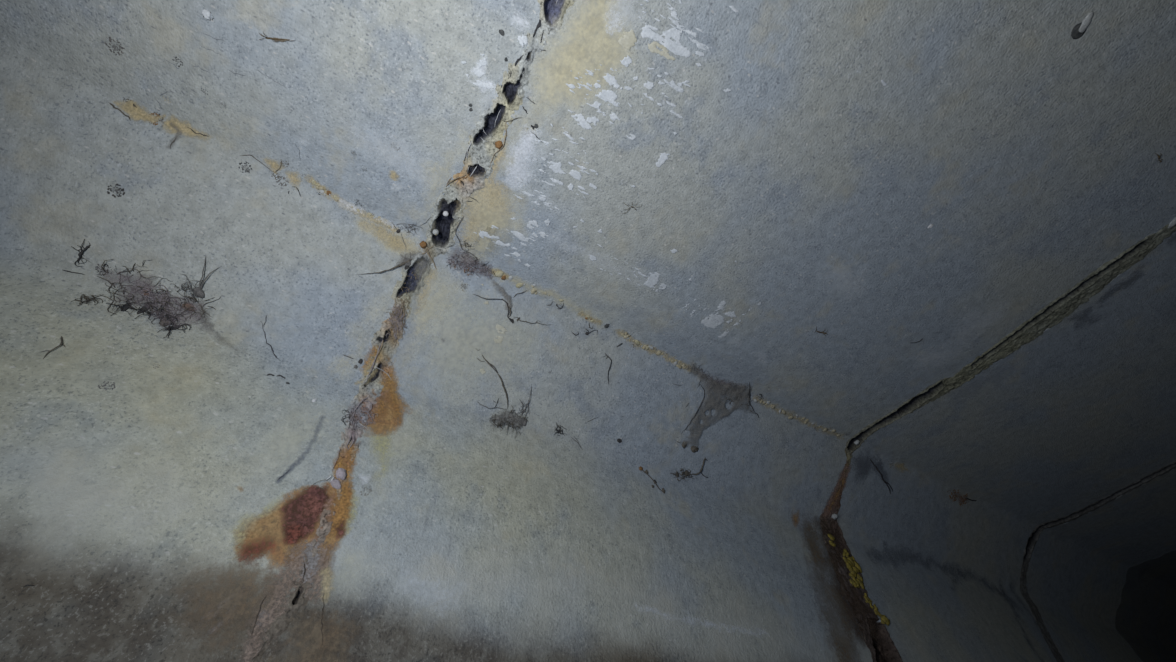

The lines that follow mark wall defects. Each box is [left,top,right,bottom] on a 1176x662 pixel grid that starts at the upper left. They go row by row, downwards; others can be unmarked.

spalling [462,51,533,147]
leakage [545,0,624,102]
peeling [474,0,710,267]
spalling [432,164,486,249]
leakage [463,151,506,252]
spalling [397,256,429,298]
peeling [589,229,667,292]
crack [262,323,290,384]
corrosion [355,347,407,434]
corrosion [236,445,357,566]
corrosion [819,463,875,641]
crack [302,563,324,643]